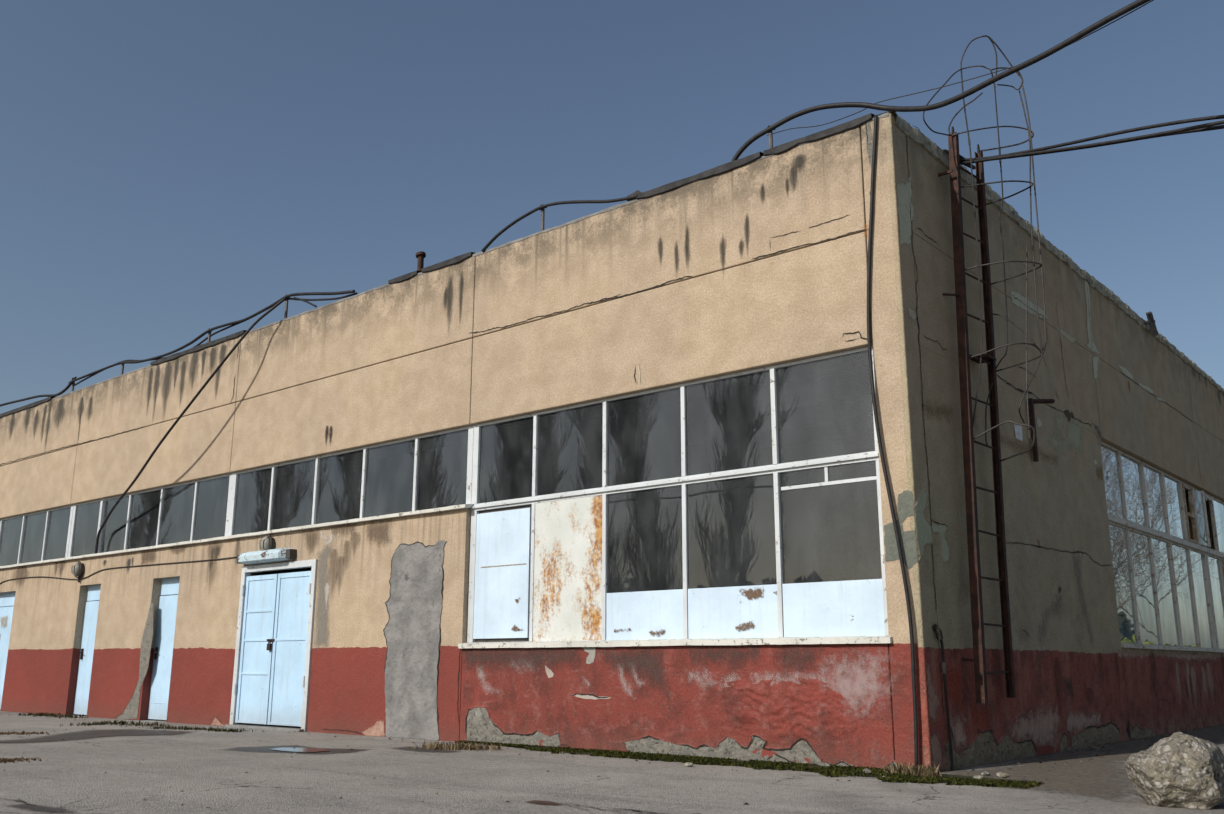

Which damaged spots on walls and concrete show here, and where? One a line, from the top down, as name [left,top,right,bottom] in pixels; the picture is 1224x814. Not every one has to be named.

damp [786,156,804,193]
peeling [897,177,915,245]
damp [658,228,689,271]
damp [720,216,749,266]
damp [147,345,226,406]
damp [10,397,92,443]
peeling [913,488,950,565]
crack [1008,542,1107,566]
flaking render [465,705,570,747]
flaking render [926,665,1101,771]
flaking render [623,733,855,767]